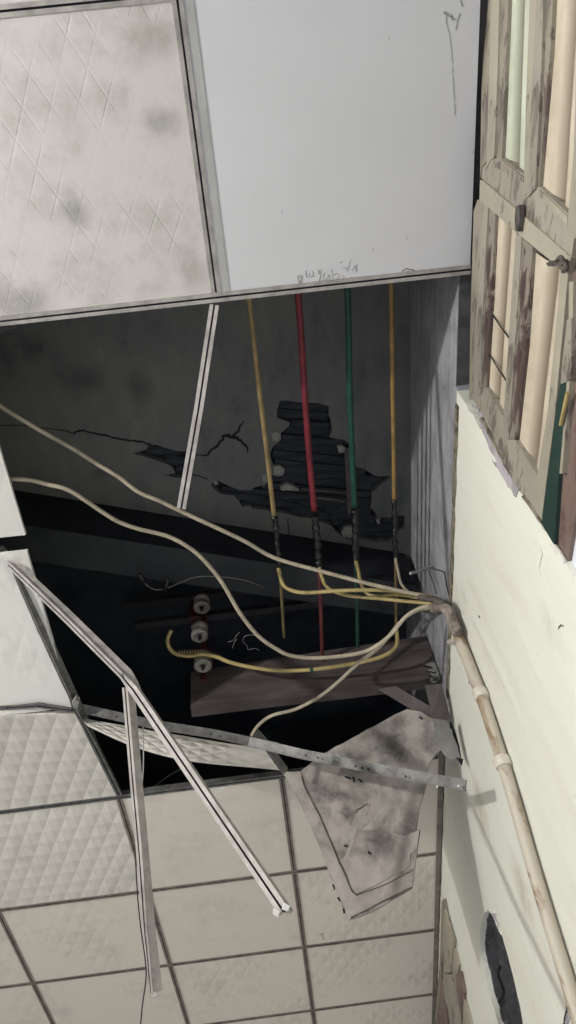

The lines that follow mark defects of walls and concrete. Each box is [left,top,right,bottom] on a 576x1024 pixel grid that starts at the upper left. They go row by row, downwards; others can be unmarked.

crack [0,425,152,445]
crack [183,420,249,479]
spalling [213,400,404,539]